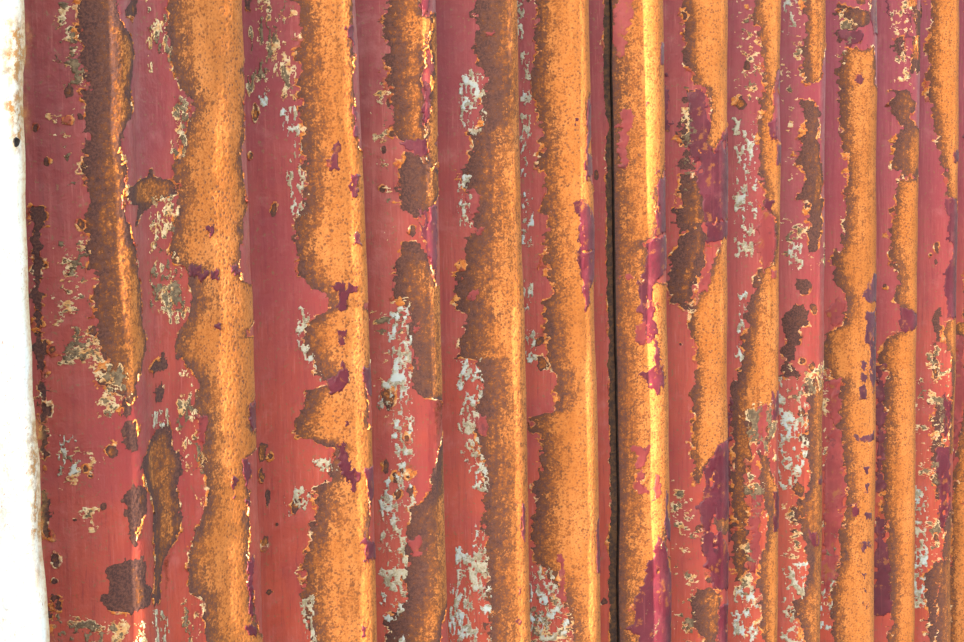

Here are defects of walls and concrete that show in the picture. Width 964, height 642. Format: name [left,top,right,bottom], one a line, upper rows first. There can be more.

peeling [890,0,914,88]
peeling [731,117,758,258]
corrosion [62,0,275,642]
corrosion [289,0,448,642]
corrosion [377,0,964,642]
peeling [44,428,105,491]
peeling [52,609,170,642]
peeling [152,369,210,480]
peeling [369,297,416,622]
peeling [670,480,699,642]
peeling [730,538,762,642]
peeling [739,361,831,642]